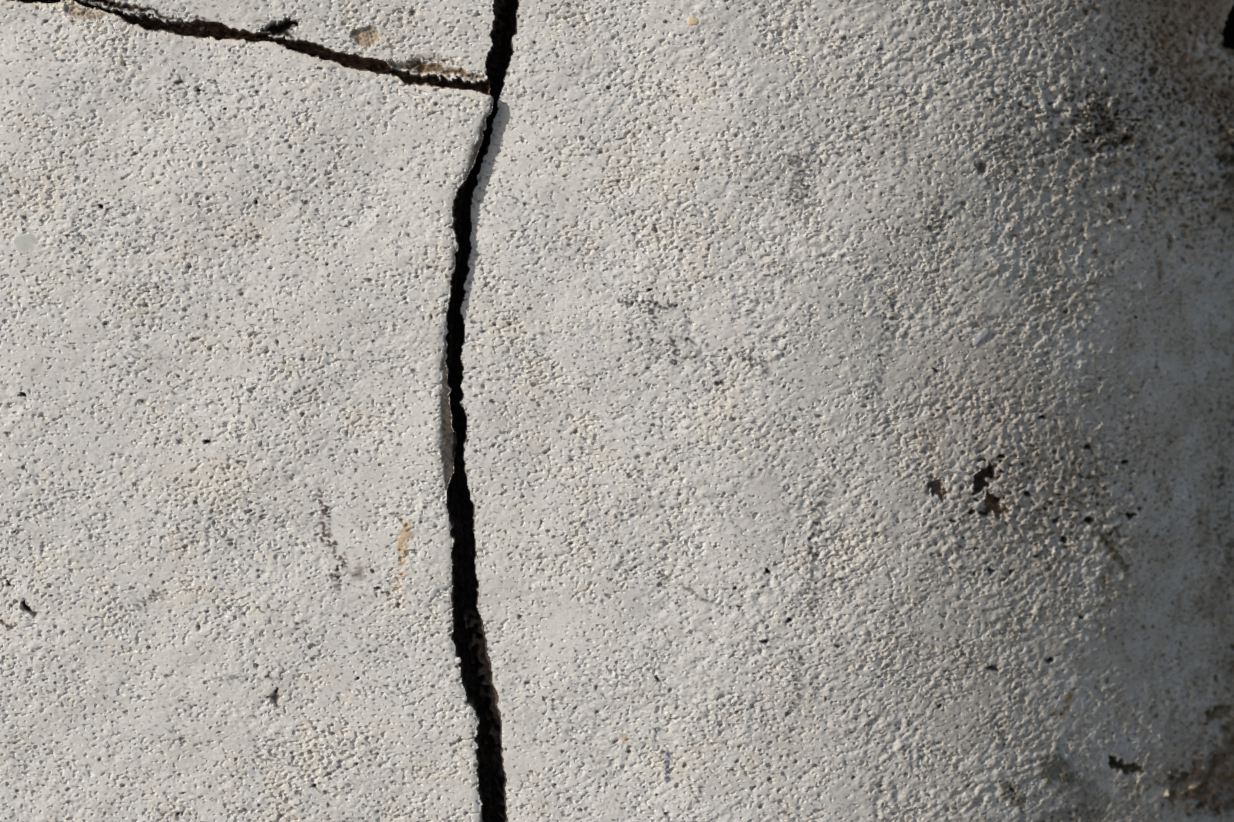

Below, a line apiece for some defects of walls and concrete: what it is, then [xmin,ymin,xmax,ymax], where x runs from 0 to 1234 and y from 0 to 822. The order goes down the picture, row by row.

crack [10,0,519,822]